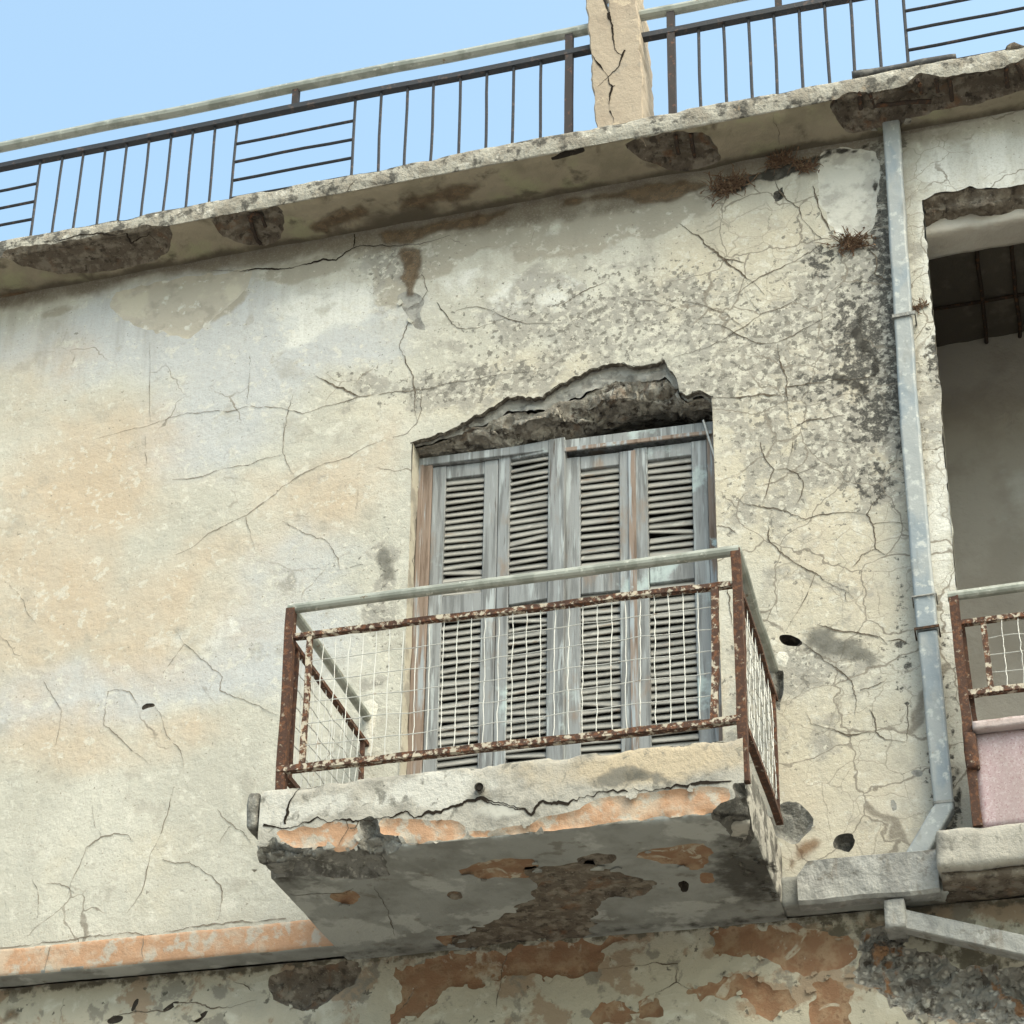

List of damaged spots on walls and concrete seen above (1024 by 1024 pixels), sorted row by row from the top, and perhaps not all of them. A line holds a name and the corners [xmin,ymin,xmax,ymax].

crack [592,12,625,118]
spalling [830,42,1024,133]
spalling [922,184,1024,228]
damp [381,210,506,295]
crack [100,274,571,554]
spalling [416,379,713,459]
crack [634,177,910,742]
damp [831,373,866,396]
damp [850,312,880,376]
damp [808,629,873,660]
crack [218,780,731,843]
peeling [251,783,755,909]